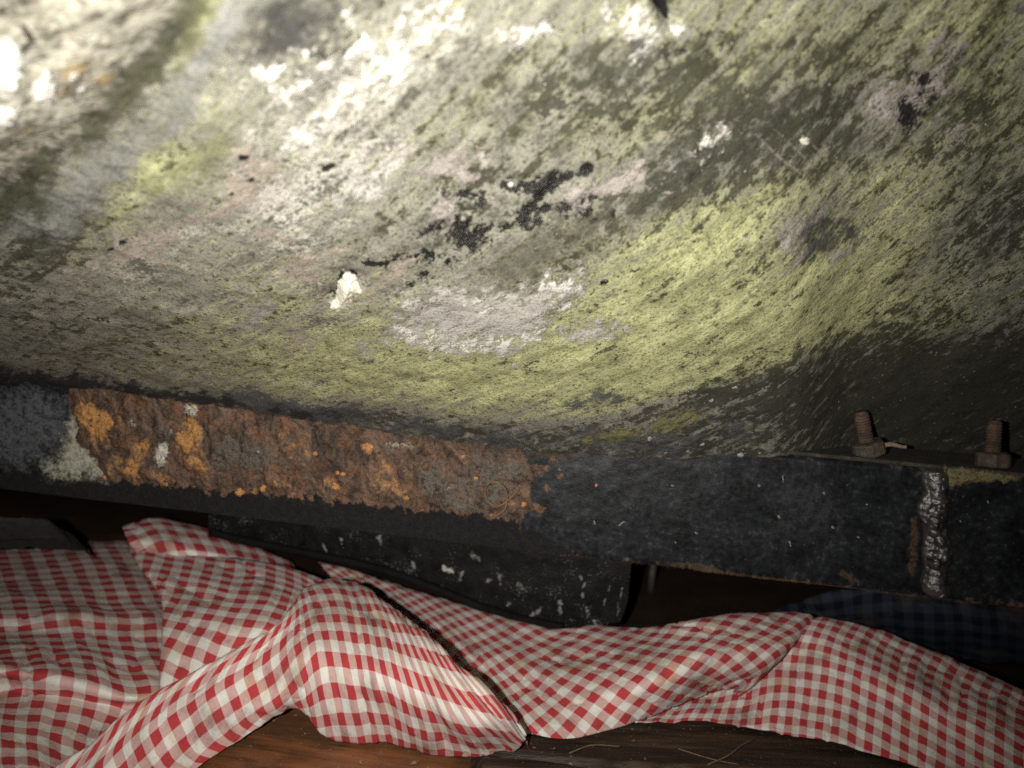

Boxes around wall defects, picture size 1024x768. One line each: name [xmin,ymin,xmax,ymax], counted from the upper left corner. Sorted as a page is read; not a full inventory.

damp [325,126,503,239]
damp [544,155,673,218]
corrosion [66,388,576,523]
damp [219,385,749,461]